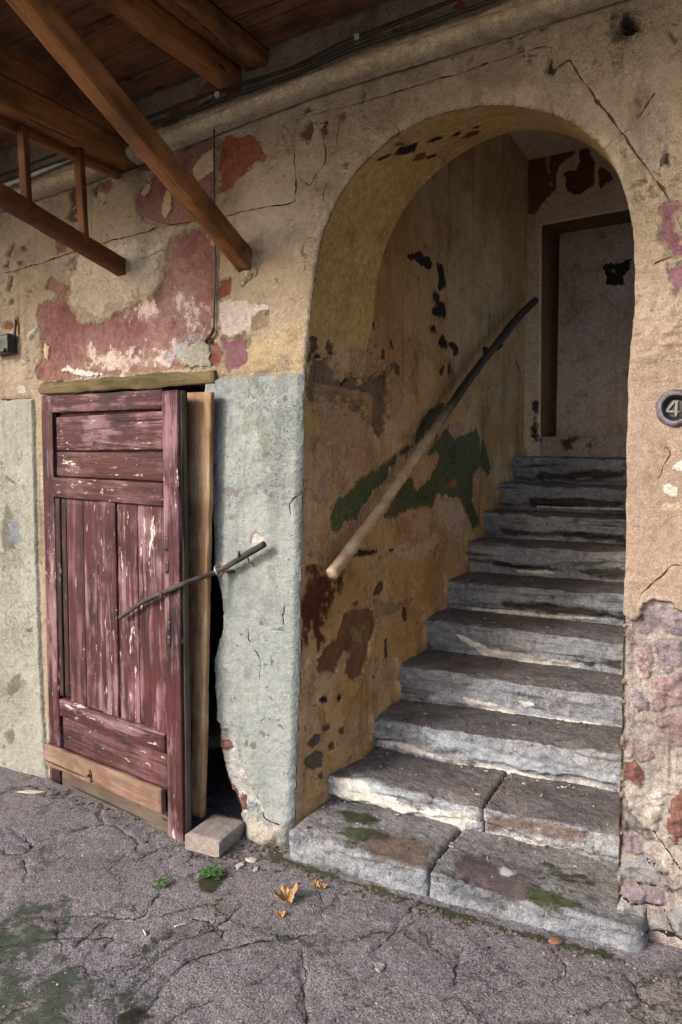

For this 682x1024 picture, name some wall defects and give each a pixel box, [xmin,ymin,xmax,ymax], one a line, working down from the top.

crack [0,251,76,274]
crack [100,220,195,259]
flaking render [37,163,269,382]
flaking render [175,133,267,201]
peeling [407,251,459,356]
crack [228,46,670,216]
flaking render [527,148,613,215]
flaking render [633,151,682,293]
peeling [328,392,493,543]
flaking render [317,581,413,685]
flaking render [220,729,279,825]
flaking render [617,600,682,949]